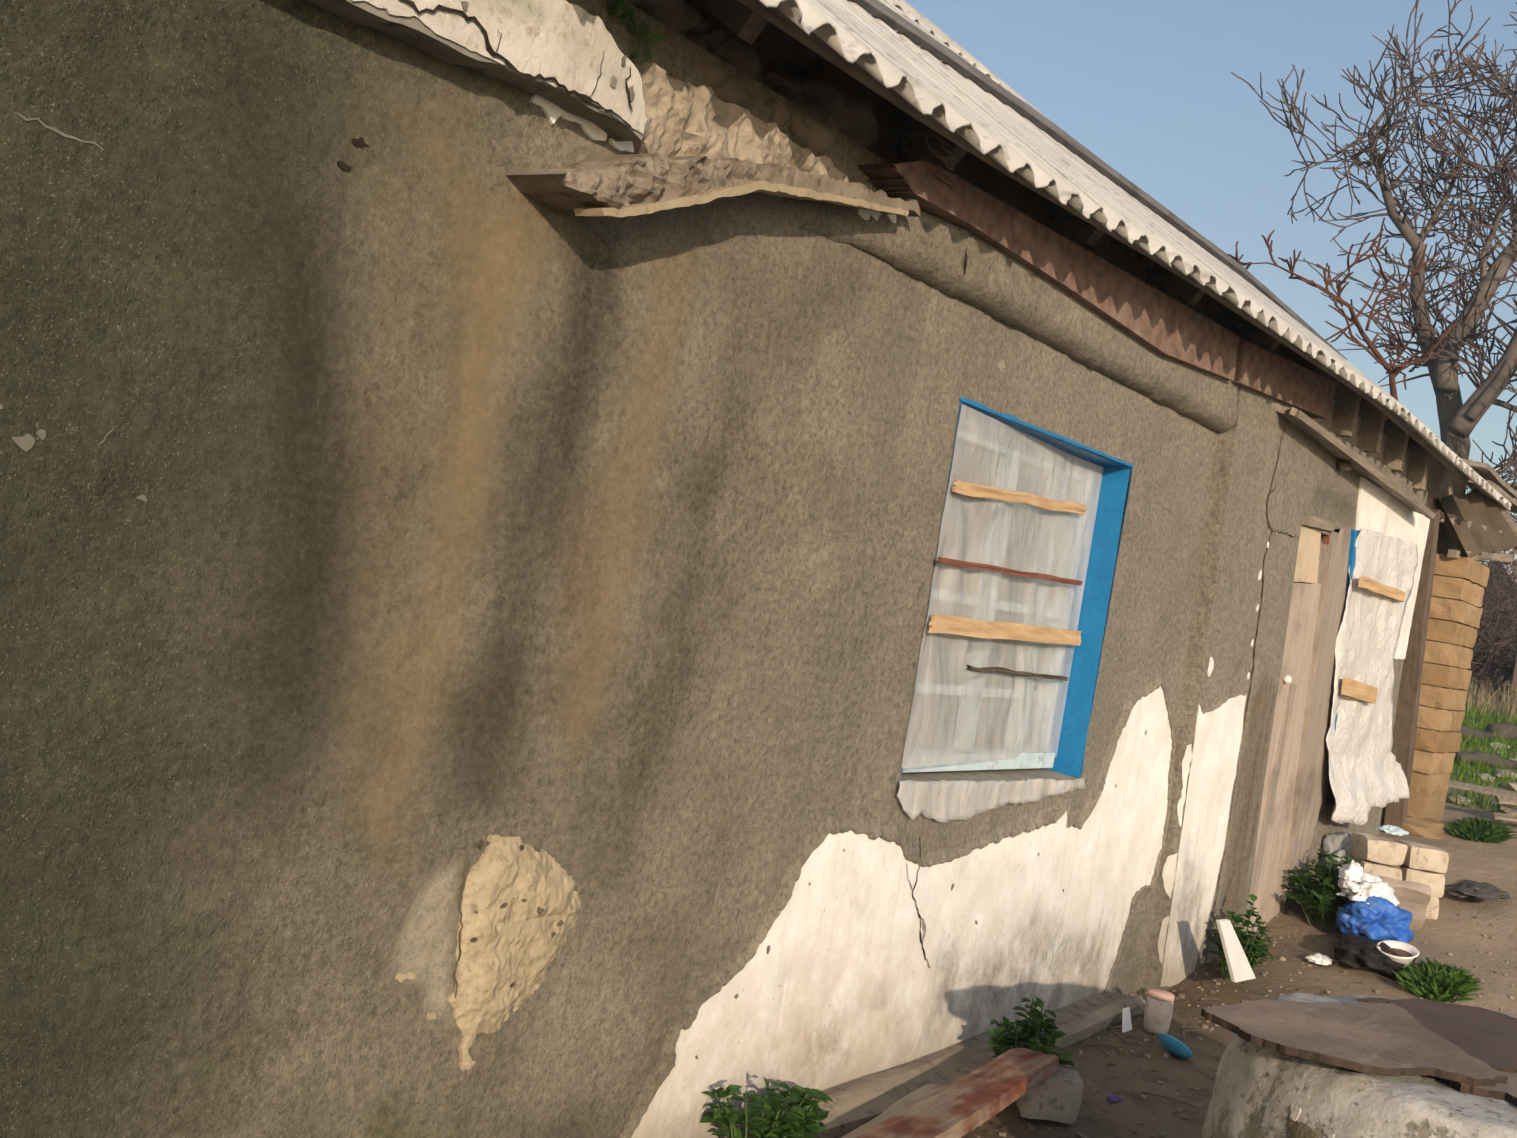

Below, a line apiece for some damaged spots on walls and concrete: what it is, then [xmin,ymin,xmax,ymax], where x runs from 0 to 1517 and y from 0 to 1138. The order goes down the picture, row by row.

crack [403,0,634,132]
peeling [350,0,849,183]
crack [1209,420,1297,937]
peeling [395,971,415,983]
spalling [500,899,564,938]
crack [906,836,930,968]
flaking render [619,675,1247,1138]